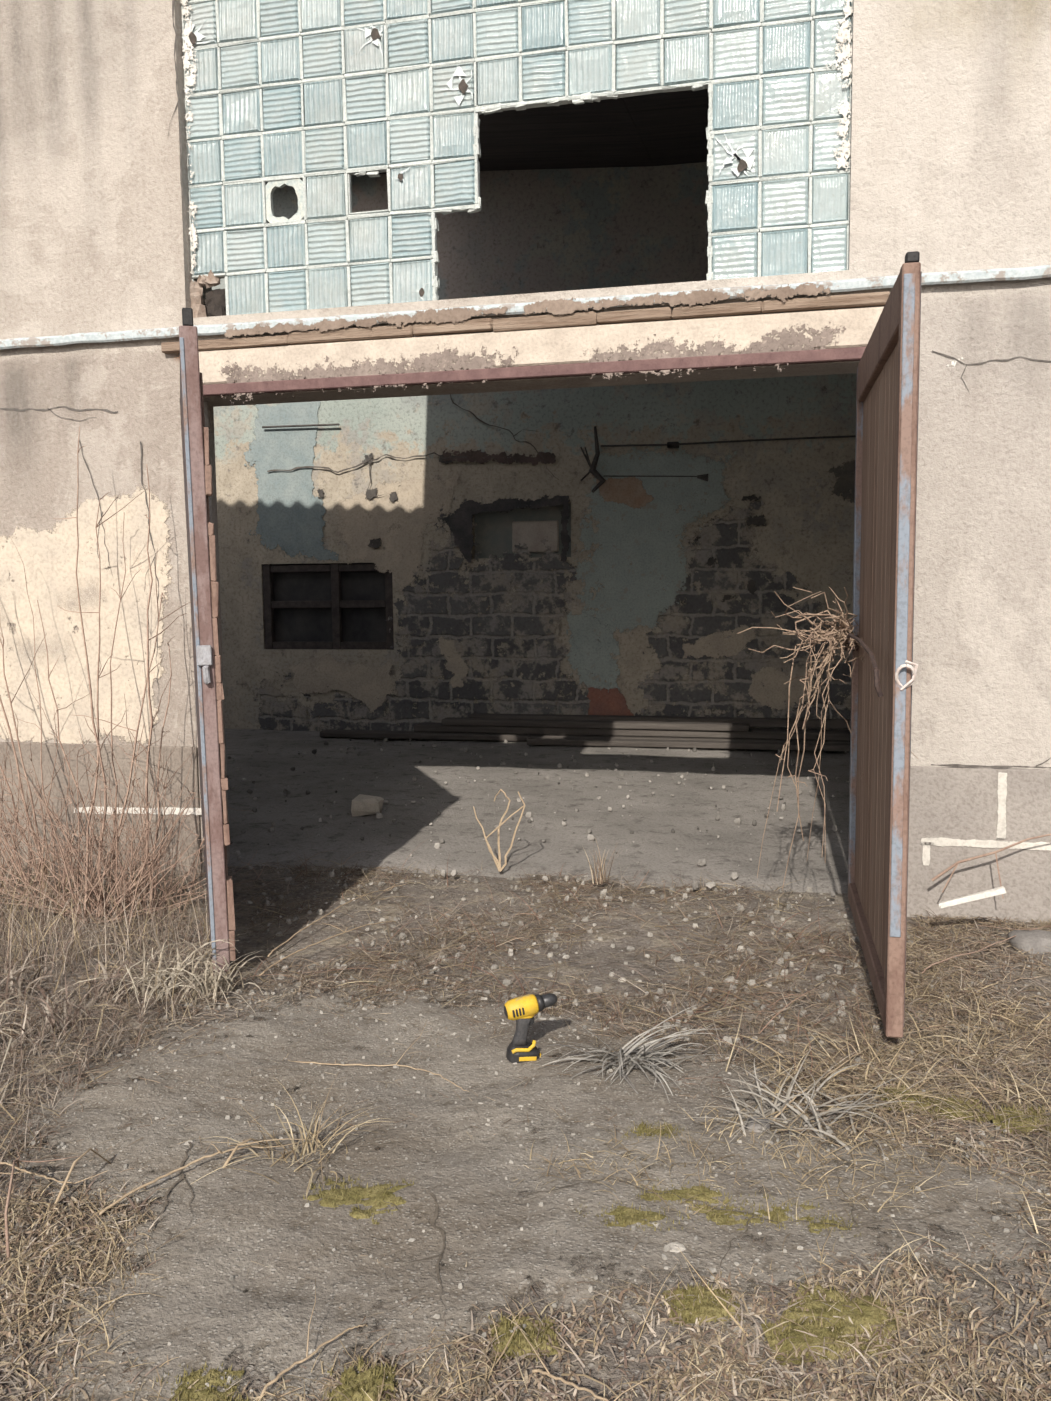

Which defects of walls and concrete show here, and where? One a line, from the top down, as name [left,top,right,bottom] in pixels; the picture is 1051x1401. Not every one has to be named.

peeling [180,0,220,318]
spalling [224,80,831,338]
peeling [826,0,853,171]
spalling [580,322,846,380]
crack [932,350,1051,394]
crack [0,406,159,700]
peeling [0,486,173,745]
spalling [221,344,855,731]